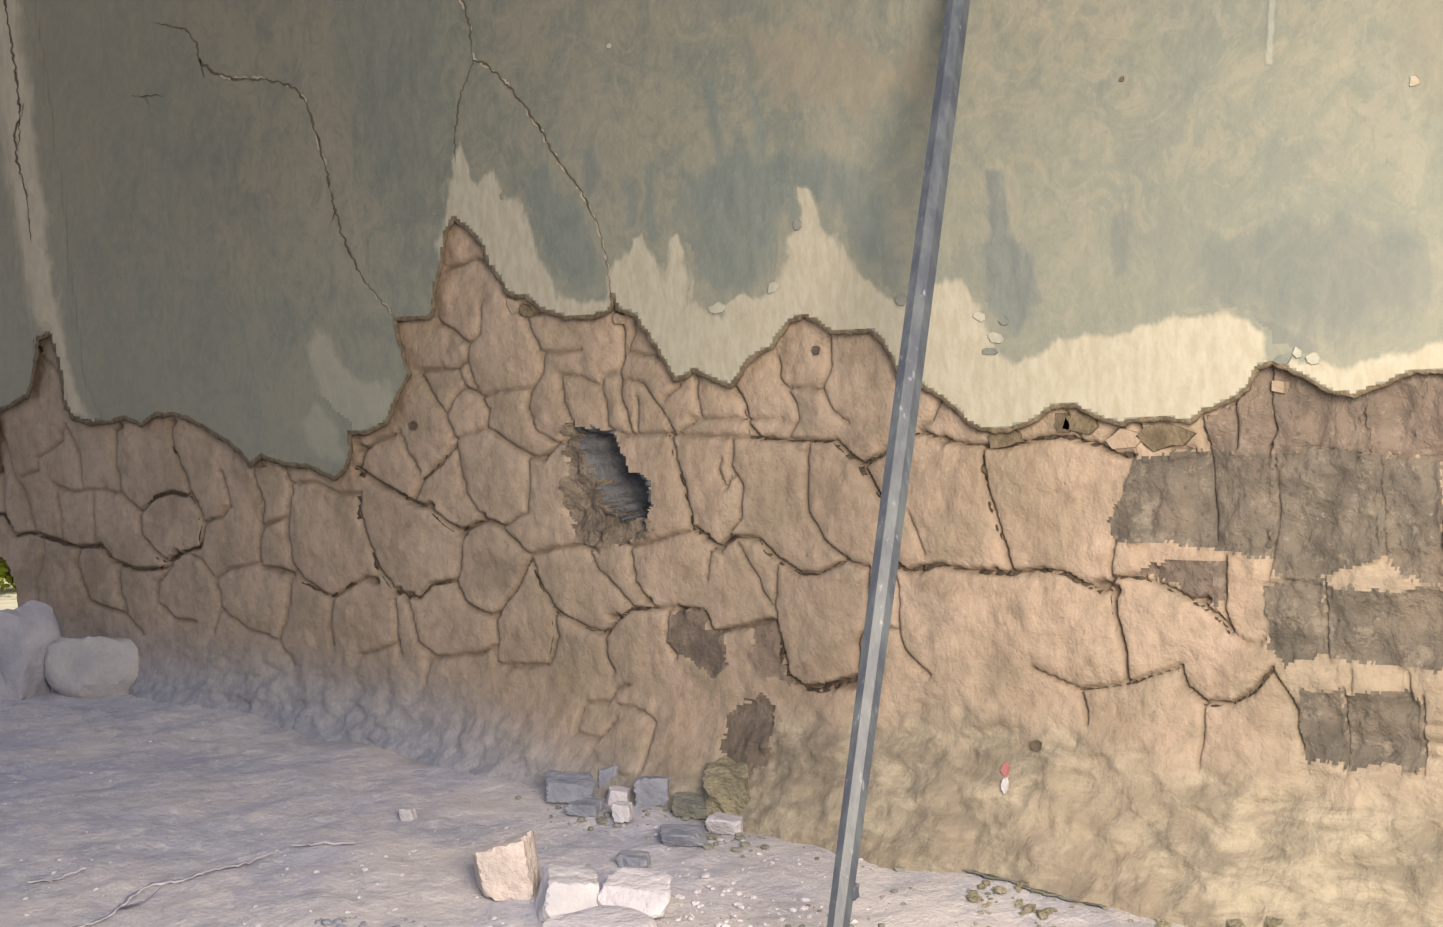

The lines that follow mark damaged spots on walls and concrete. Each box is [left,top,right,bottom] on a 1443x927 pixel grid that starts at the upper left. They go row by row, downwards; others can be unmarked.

crack [3,0,31,241]
crack [152,22,395,319]
water stain [1100,199,1141,287]
water stain [1157,0,1443,385]
crack [0,491,202,571]
crack [302,467,452,599]
flaking render [0,136,909,854]
crack [669,435,844,575]
crack [779,641,858,693]
crack [745,409,1230,634]
flaking render [859,269,1443,927]
crack [1080,668,1274,706]